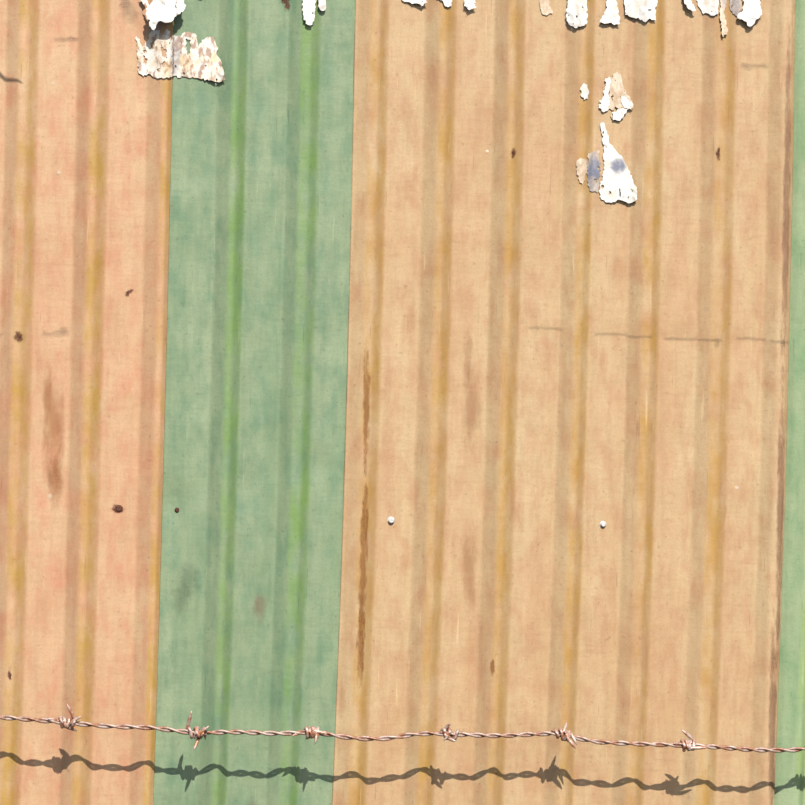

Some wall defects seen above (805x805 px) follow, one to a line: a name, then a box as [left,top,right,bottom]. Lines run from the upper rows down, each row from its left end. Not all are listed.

peeling [302,0,326,25]
peeling [539,0,553,16]
peeling [566,0,588,28]
peeling [600,0,658,25]
peeling [684,0,762,37]
peeling [135,0,225,82]
peeling [576,72,637,203]